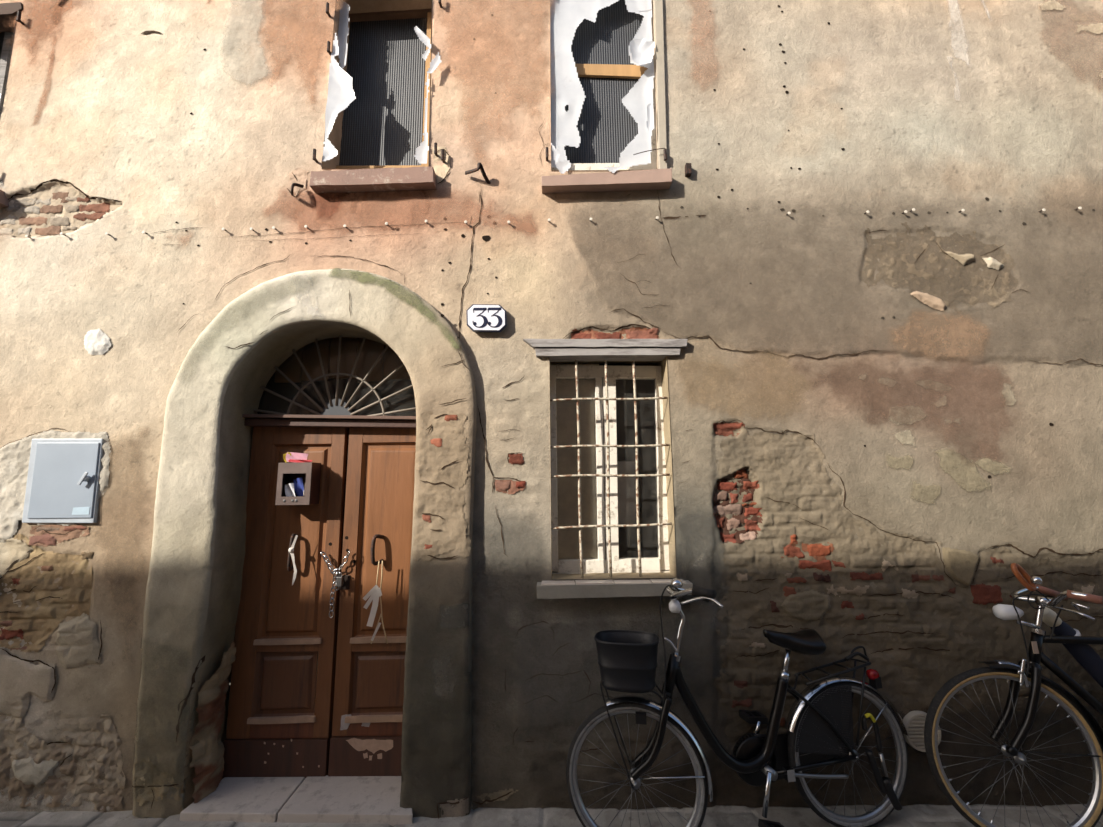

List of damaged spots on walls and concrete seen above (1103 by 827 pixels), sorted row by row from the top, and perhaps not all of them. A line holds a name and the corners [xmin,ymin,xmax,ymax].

leakage [949,0,969,64]
spalling [0,178,122,238]
crack [216,193,482,368]
spalling [564,324,659,339]
crack [609,254,882,360]
spalling [859,211,1031,313]
crack [1030,358,1103,366]
crack [478,409,520,557]
spalling [0,524,102,693]
spalling [711,419,1103,746]
spalling [0,642,236,812]